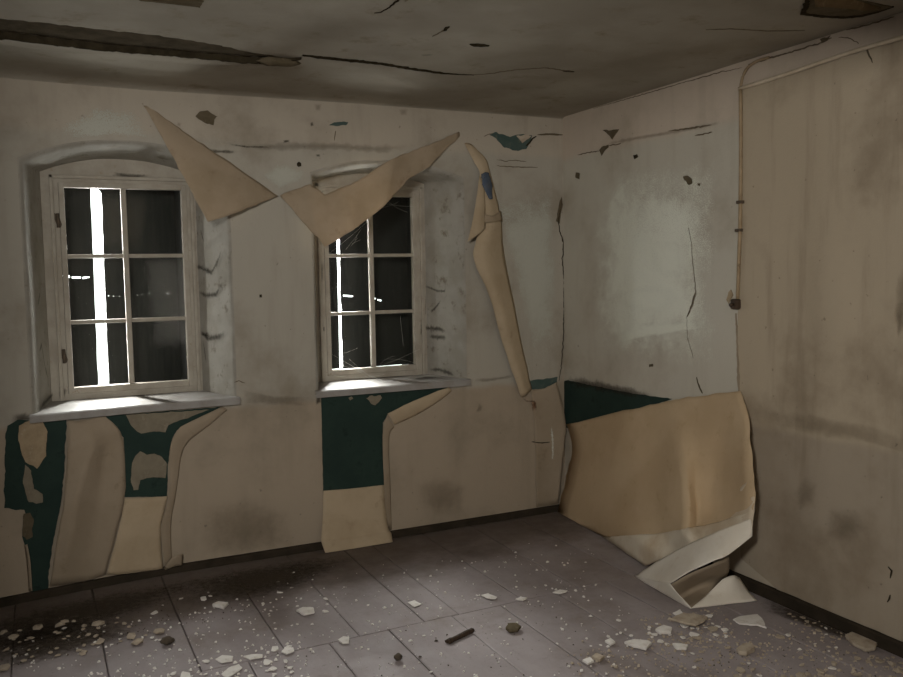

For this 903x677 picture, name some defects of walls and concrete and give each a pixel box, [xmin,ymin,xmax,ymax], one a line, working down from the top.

spalling [139,0,204,8]
spalling [800,0,894,19]
crack [0,19,574,76]
spalling [196,110,217,125]
spalling [485,132,537,151]
crack [670,125,712,136]
crack [556,197,564,380]
crack [686,228,703,393]
peeling [321,387,451,553]
peeling [530,377,671,507]
peeling [3,407,227,592]